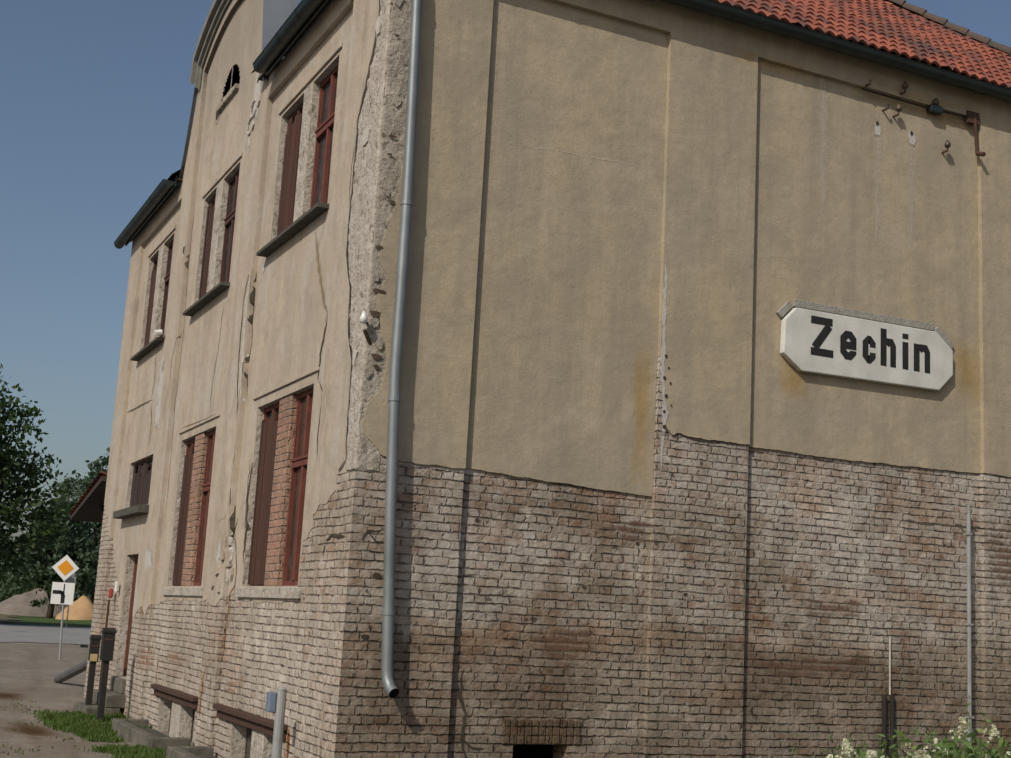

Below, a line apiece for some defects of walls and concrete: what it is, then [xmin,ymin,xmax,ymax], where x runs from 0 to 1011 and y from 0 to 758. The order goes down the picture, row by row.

crack [219,460,238,590]
peeling [238,275,251,402]
crack [127,0,380,544]
spalling [346,0,412,471]